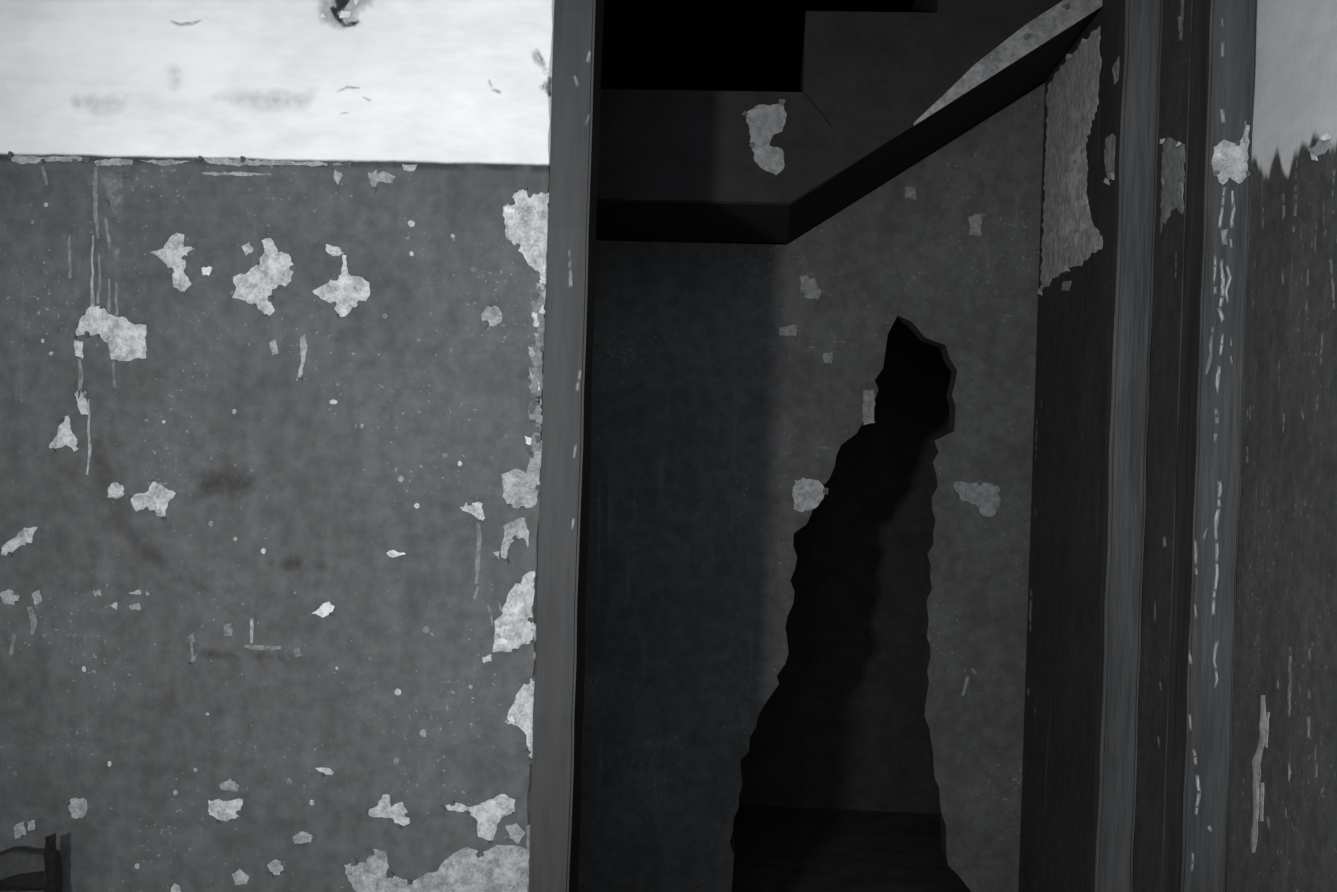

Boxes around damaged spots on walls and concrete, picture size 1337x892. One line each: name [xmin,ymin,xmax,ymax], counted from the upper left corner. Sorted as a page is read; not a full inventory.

peeling [368,164,417,194]
peeling [742,99,787,175]
peeling [1038,26,1119,295]
peeling [1295,132,1332,179]
peeling [7,151,351,475]
peeling [313,244,370,319]
spalling [460,186,549,663]
peeling [108,478,176,522]
spalling [505,675,535,764]
peeling [208,778,244,824]
peeling [344,794,530,892]